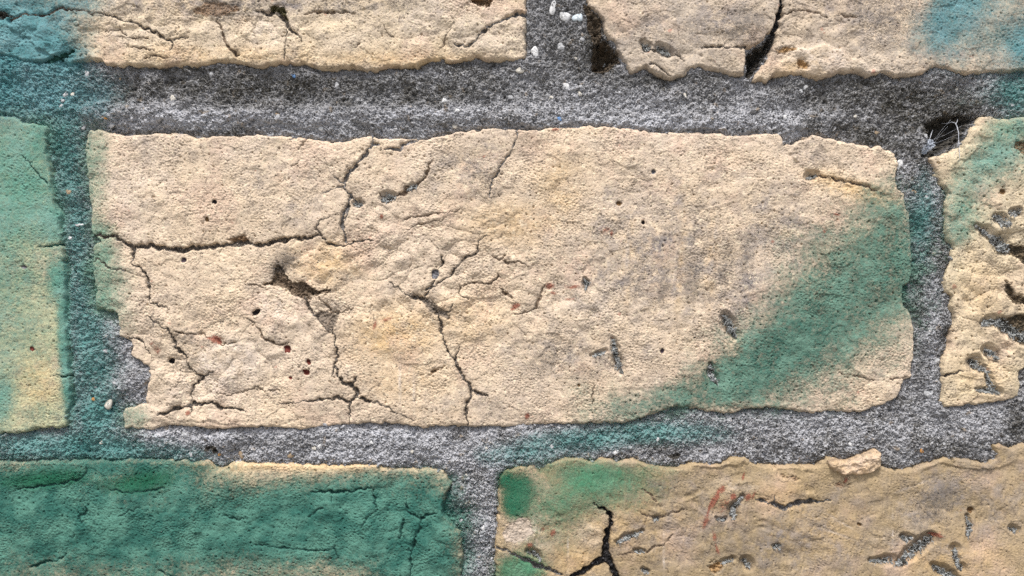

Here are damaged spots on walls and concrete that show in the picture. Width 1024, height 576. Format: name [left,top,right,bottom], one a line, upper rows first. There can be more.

crack [10,6,186,59]
crack [216,20,239,57]
crack [256,11,355,60]
crack [440,12,526,48]
crack [640,0,858,76]
crack [489,130,518,197]
crack [93,136,460,424]
spalling [990,238,1024,264]
crack [389,235,545,427]
spalling [1000,282,1024,345]
crack [496,489,684,576]